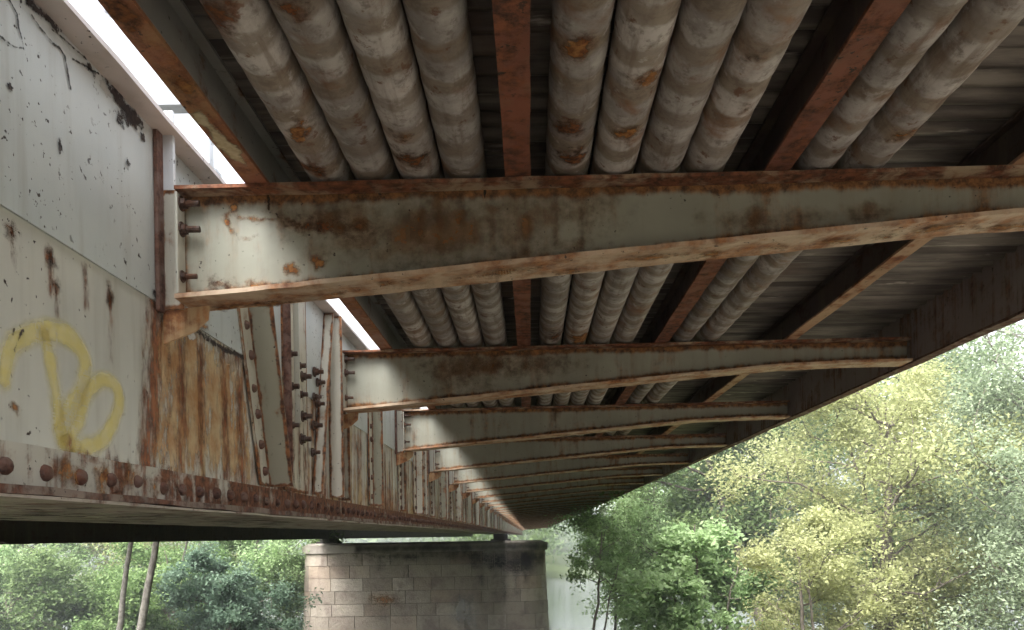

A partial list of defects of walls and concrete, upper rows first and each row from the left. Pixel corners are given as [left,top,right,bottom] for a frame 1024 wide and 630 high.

corrosion [288,120,312,143]
corrosion [393,135,428,169]
corrosion [224,204,273,232]
corrosion [45,248,60,299]
corrosion [283,262,298,274]
corrosion [140,299,250,484]